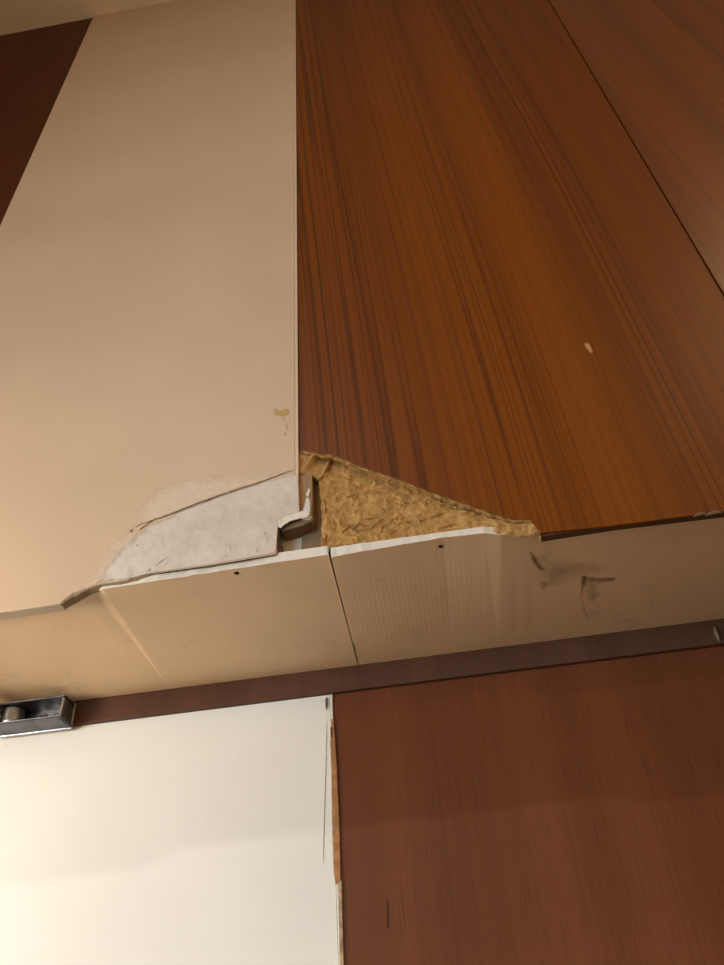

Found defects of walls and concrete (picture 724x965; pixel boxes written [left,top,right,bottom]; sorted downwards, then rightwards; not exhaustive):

flaking render [61,471,340,608]